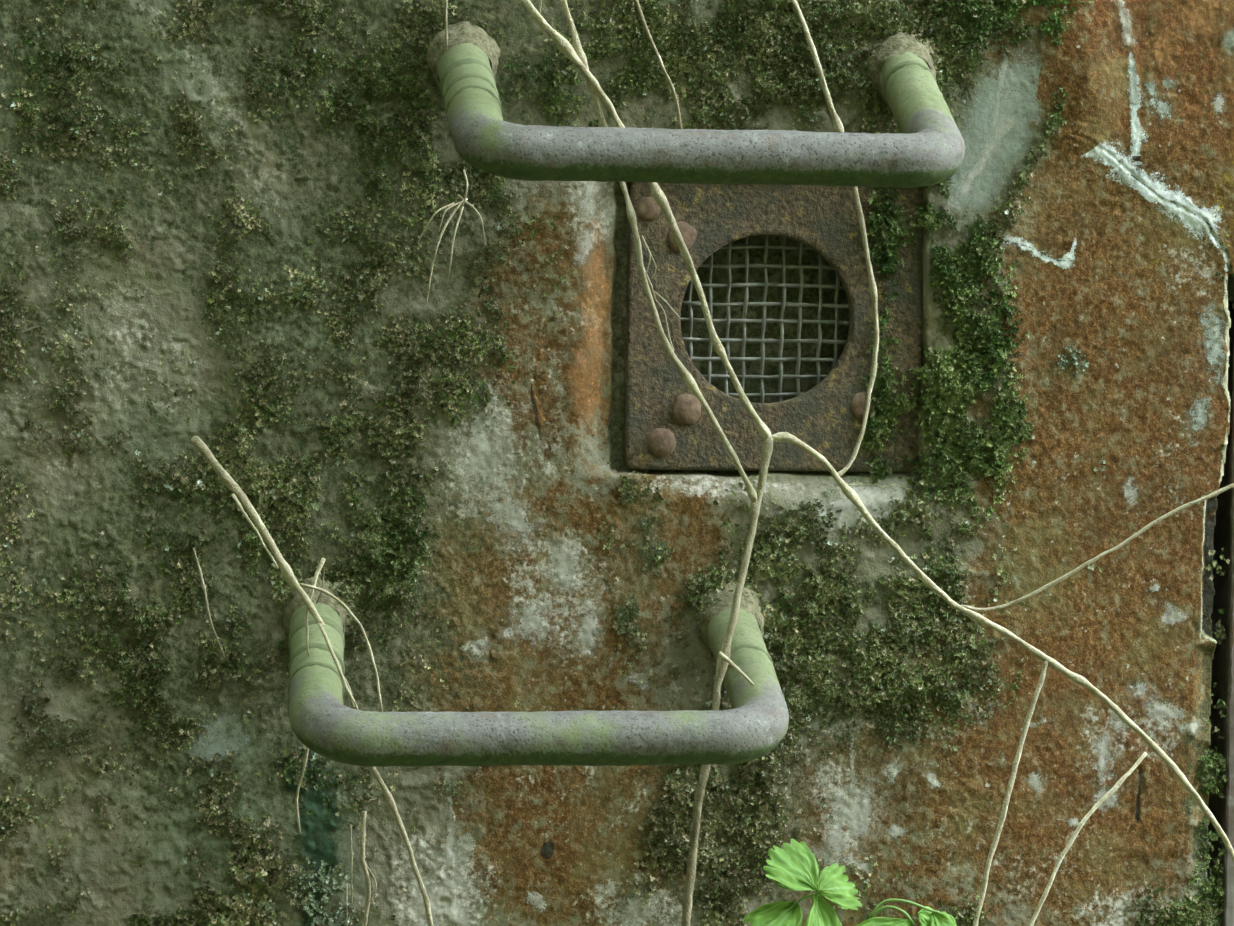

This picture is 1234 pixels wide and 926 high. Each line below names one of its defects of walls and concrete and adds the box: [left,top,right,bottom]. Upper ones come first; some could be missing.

crack [1081,75,1230,272]
rust [567,237,610,425]